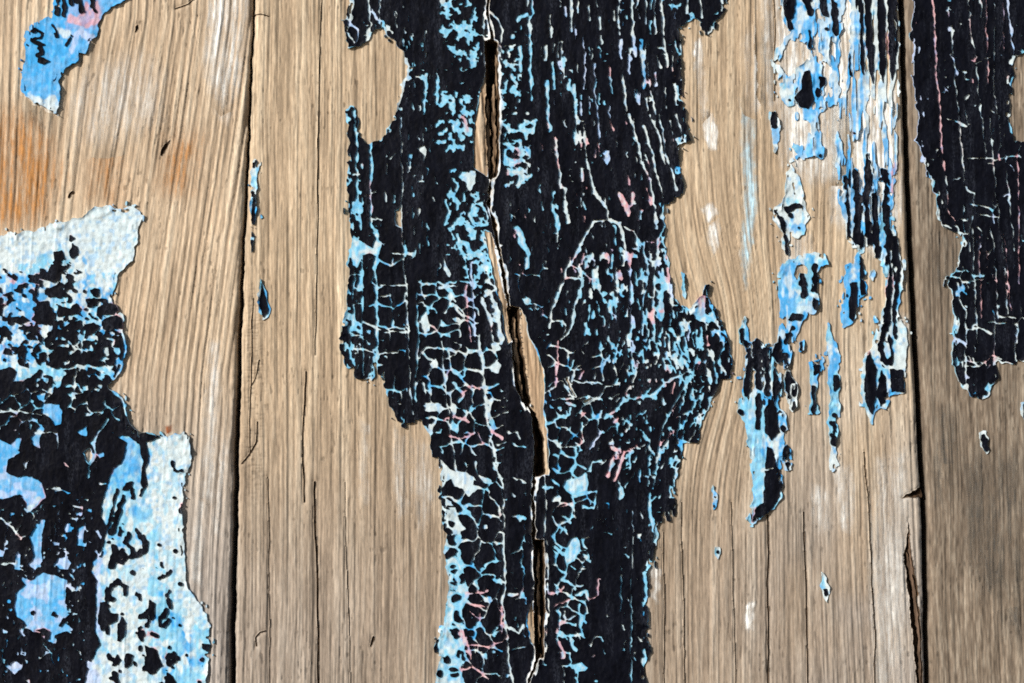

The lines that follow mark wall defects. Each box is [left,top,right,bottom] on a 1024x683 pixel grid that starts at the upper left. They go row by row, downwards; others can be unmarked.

peeling [18,0,125,116]
peeling [248,159,263,252]
peeling [257,279,271,320]
crack [473,0,550,683]
peeling [339,0,1024,683]
peeling [0,201,215,683]
crack [903,526,923,683]